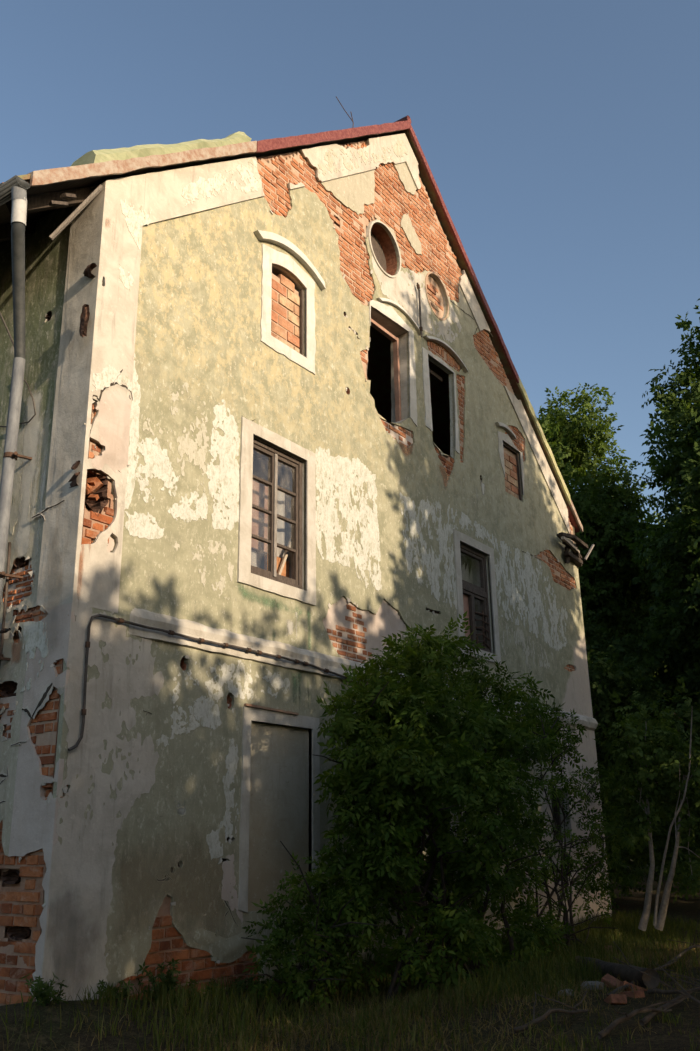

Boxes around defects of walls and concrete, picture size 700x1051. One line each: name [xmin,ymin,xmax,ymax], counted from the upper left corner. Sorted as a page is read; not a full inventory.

flaking render [181,151,466,476]
flaking render [473,330,514,394]